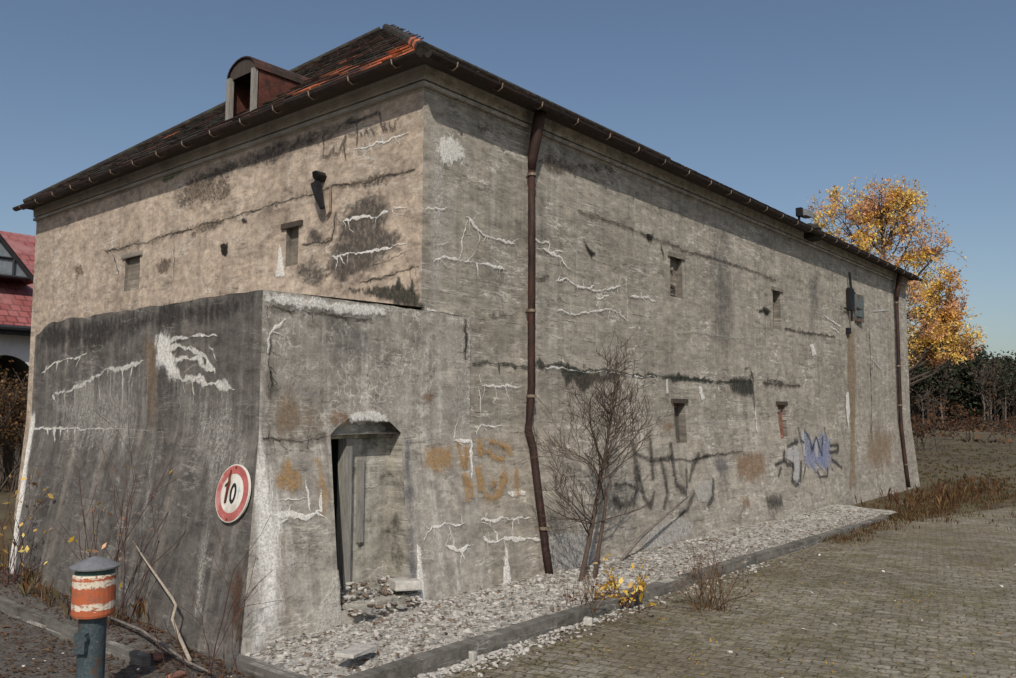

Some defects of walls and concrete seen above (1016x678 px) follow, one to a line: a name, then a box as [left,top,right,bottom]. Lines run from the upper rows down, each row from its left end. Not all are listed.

crack [355,134,404,151]
damp [276,247,285,277]
damp [265,292,385,315]
damp [298,195,400,286]
crack [105,169,662,394]
crack [34,353,147,441]
crack [262,422,331,453]
crack [454,325,521,478]
crack [423,490,541,569]